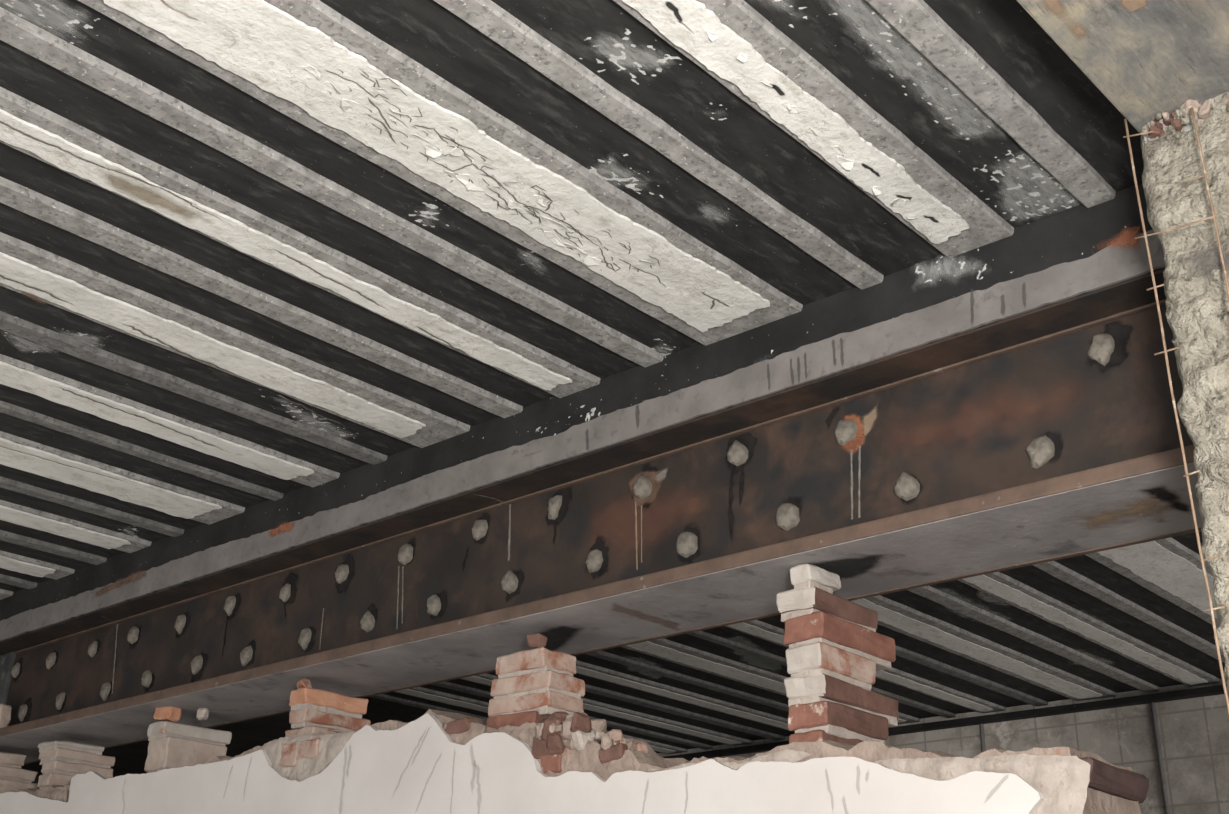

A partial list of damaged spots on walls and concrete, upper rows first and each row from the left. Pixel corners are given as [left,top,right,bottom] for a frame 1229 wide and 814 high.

water stain [34,4,99,44]
crack [161,0,198,20]
crack [666,1,682,22]
crack [771,84,785,96]
crack [0,121,212,215]
crack [306,70,665,286]
crack [862,164,938,223]
crack [276,250,384,308]
crack [702,292,730,309]
corrosion [826,408,877,519]
corrosion [269,523,294,536]
corrosion [629,469,667,570]